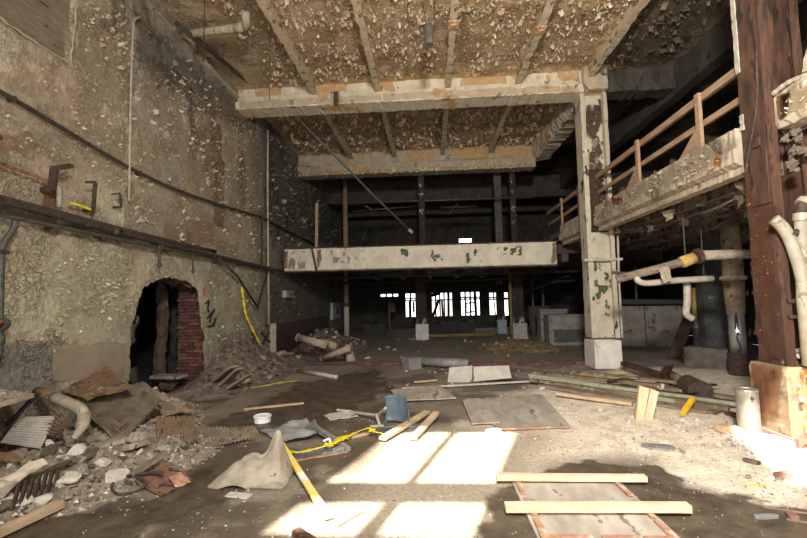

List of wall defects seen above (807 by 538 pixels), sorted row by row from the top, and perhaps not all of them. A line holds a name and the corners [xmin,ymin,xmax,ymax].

peeling [530,0,630,80]
flaking render [0,0,557,260]
corrosion [776,92,790,120]
peeling [778,83,807,125]
spalling [779,127,807,172]
corrosion [43,191,56,208]
peeling [594,262,610,316]
spalling [50,247,336,391]
corrosion [750,363,782,419]